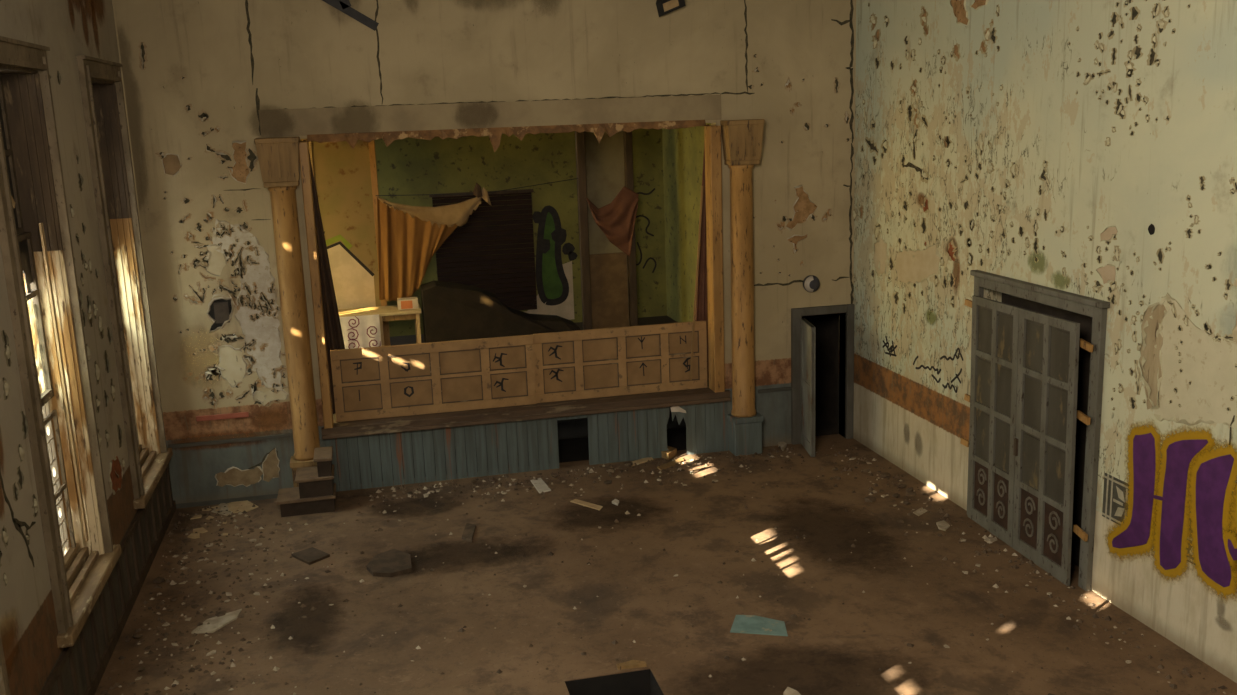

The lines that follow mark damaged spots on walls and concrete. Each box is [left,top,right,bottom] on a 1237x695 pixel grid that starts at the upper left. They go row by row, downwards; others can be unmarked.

flaking render [155,104,289,409]
crack [245,0,287,135]
crack [323,0,754,108]
crack [754,279,803,287]
flaking render [772,184,833,277]
crack [831,0,854,304]
peeling [844,99,888,180]
peeling [853,0,1065,314]
peeling [1076,0,1176,146]
flaking render [1082,226,1237,429]
peeling [1185,176,1206,239]
flaking render [215,448,280,487]